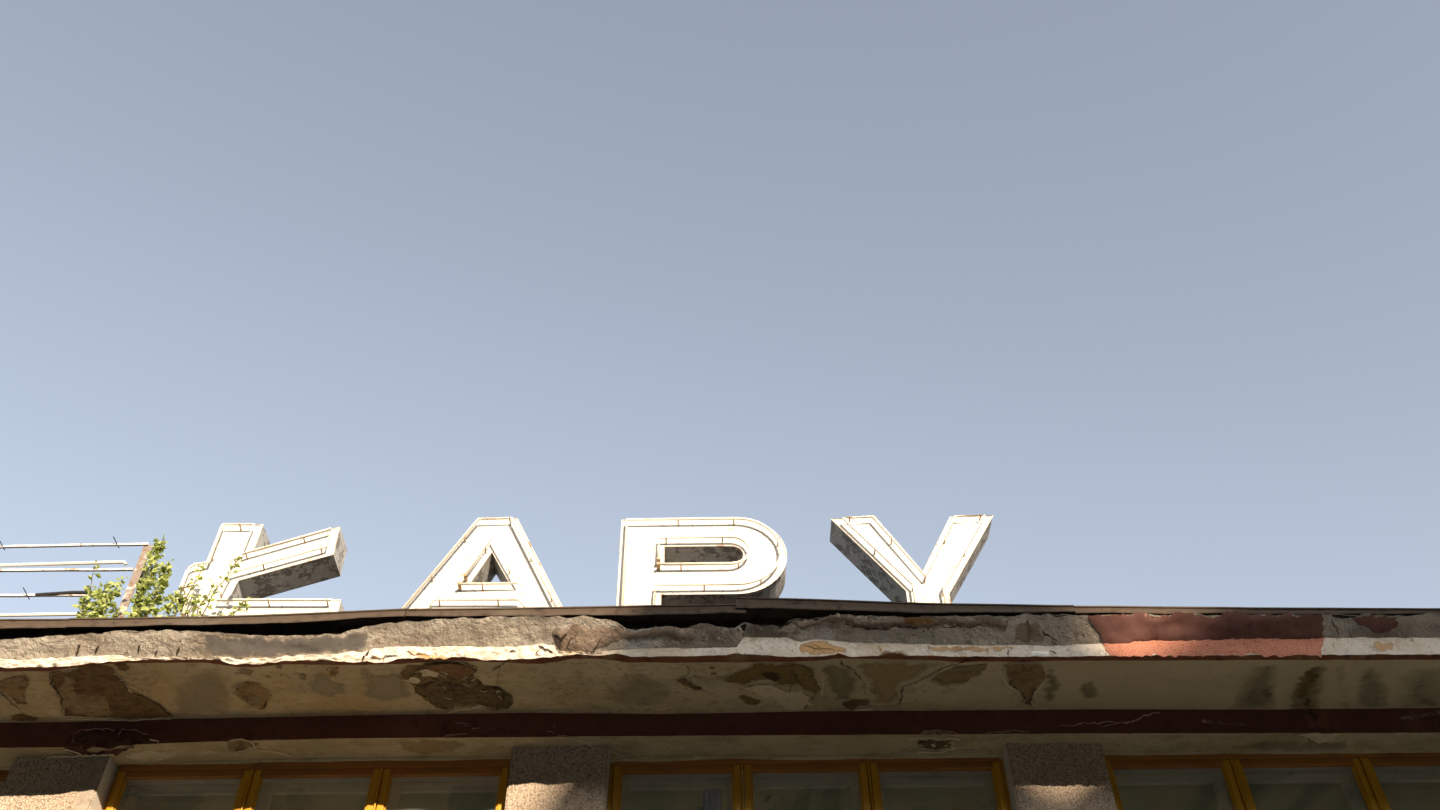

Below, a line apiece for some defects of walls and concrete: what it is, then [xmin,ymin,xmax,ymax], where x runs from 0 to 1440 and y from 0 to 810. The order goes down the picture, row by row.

flaking render [789,613,1008,631]
peeling [1353,615,1398,633]
flaking render [47,664,172,758]
flaking render [231,664,307,710]
spalling [400,661,520,713]
spalling [550,624,699,699]
flaking render [960,650,1056,708]